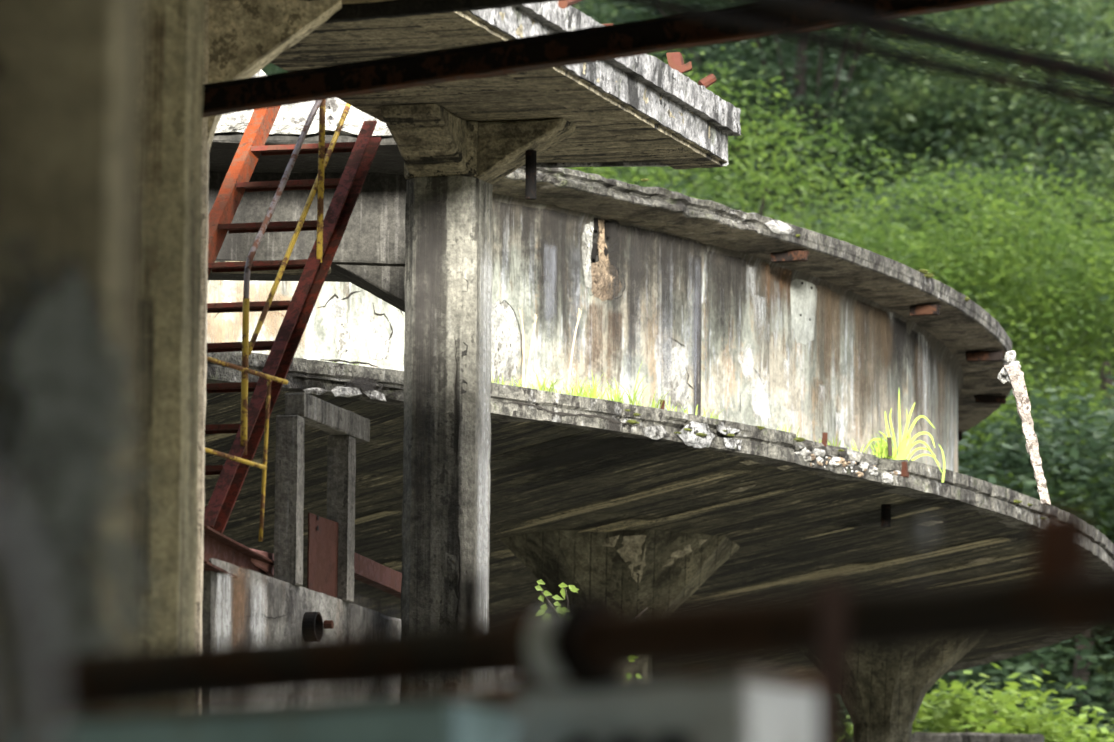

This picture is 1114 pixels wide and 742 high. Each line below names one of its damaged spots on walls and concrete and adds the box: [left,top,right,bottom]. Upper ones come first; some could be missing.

crack [317,290,403,339]
damp [484,202,581,356]
damp [609,219,763,349]
crack [320,359,380,368]
crack [494,300,639,427]
damp [742,348,770,422]
spalling [777,446,909,484]